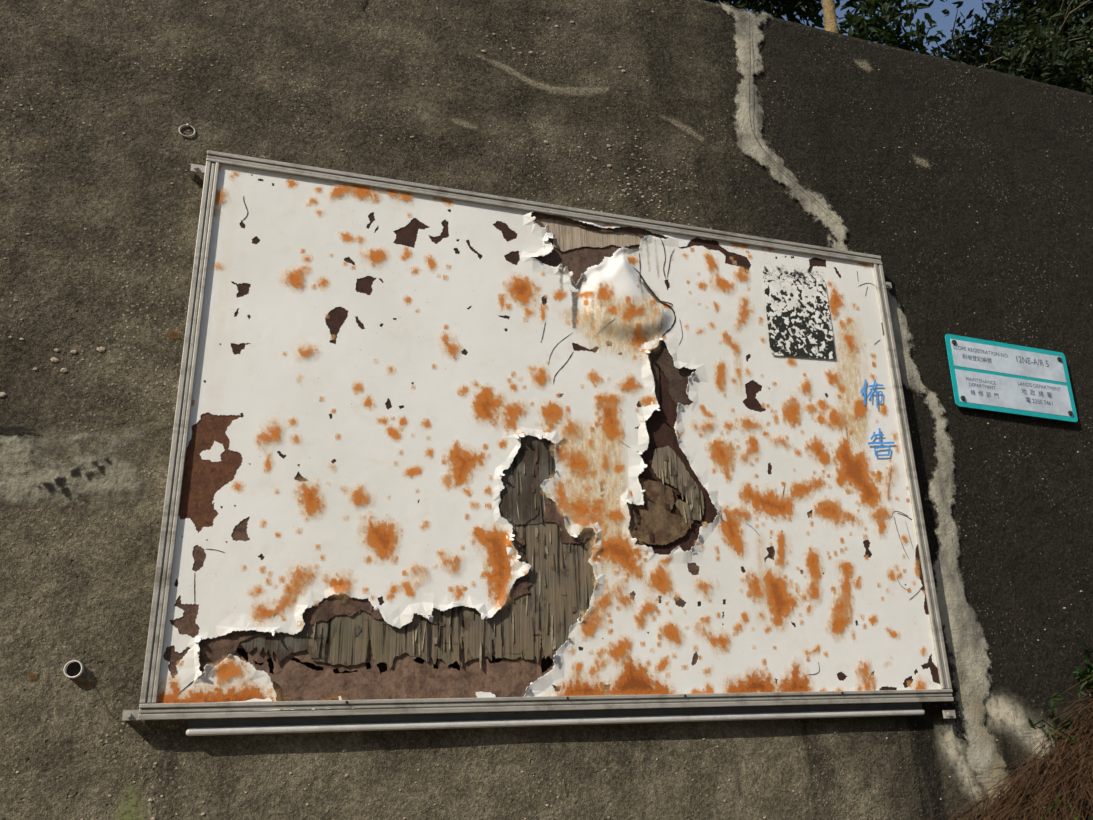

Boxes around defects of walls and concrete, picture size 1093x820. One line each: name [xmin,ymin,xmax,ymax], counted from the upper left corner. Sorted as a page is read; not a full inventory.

rust [308,183,412,215]
rust [340,232,386,267]
rust [498,271,566,321]
rust [531,212,668,239]
rust [684,243,763,352]
crack [716,2,1058,812]
peeling [179,412,250,572]
rust [294,479,325,533]
rust [342,486,430,599]
rust [421,282,909,696]
peeling [163,579,201,678]
rust [157,545,383,707]